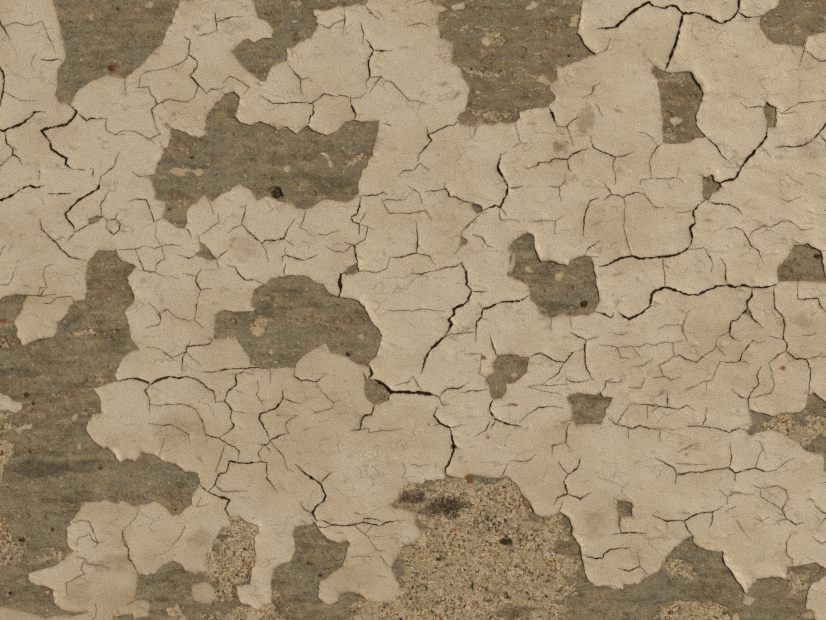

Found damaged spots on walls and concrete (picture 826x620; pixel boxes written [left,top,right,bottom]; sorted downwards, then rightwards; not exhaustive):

peeling [53,0,193,105]
peeling [233,0,368,82]
peeling [429,0,595,126]
crack [593,0,759,70]
crack [0,3,425,304]
peeling [148,92,379,228]
peeling [214,275,382,369]
crack [116,100,826,573]
peeling [507,232,600,317]
peeling [0,250,200,618]
crack [66,507,142,596]
spalling [113,474,826,620]